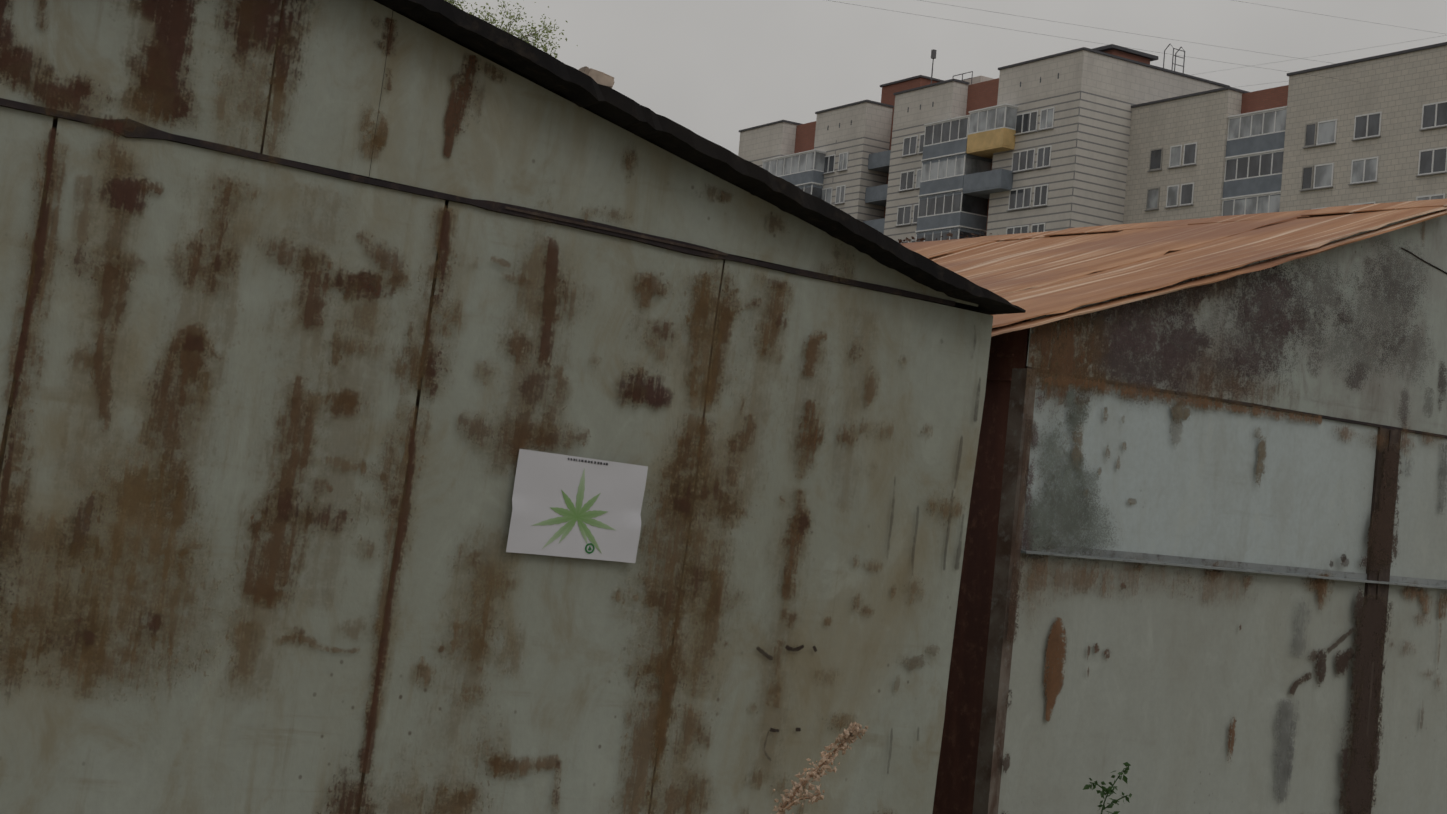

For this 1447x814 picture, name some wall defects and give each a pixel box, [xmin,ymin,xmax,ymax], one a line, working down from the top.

rust [223,0,306,92]
rust [443,55,506,158]
rust [0,0,195,685]
rust [141,324,217,523]
rust [243,376,362,608]
rust [262,206,457,814]
rust [457,236,589,458]
rust [613,273,791,814]
rust [780,400,858,626]
rust [1310,431,1441,603]
rust [1044,617,1066,721]
rust [1290,586,1447,814]